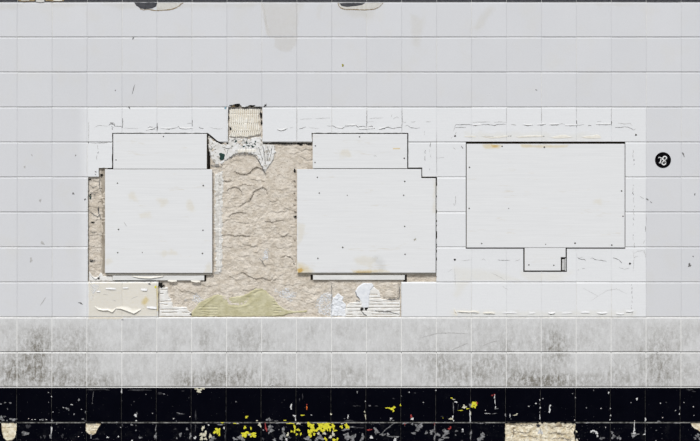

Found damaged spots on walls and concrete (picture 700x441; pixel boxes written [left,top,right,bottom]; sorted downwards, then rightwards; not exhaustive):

crack [277,108,635,170]
spalling [95,104,437,317]
spalling [84,168,128,297]
spalling [0,402,53,440]
spalling [59,399,109,440]
peeling [262,418,290,441]
peeling [341,415,399,441]
peeling [403,401,485,441]
spalling [484,396,580,441]